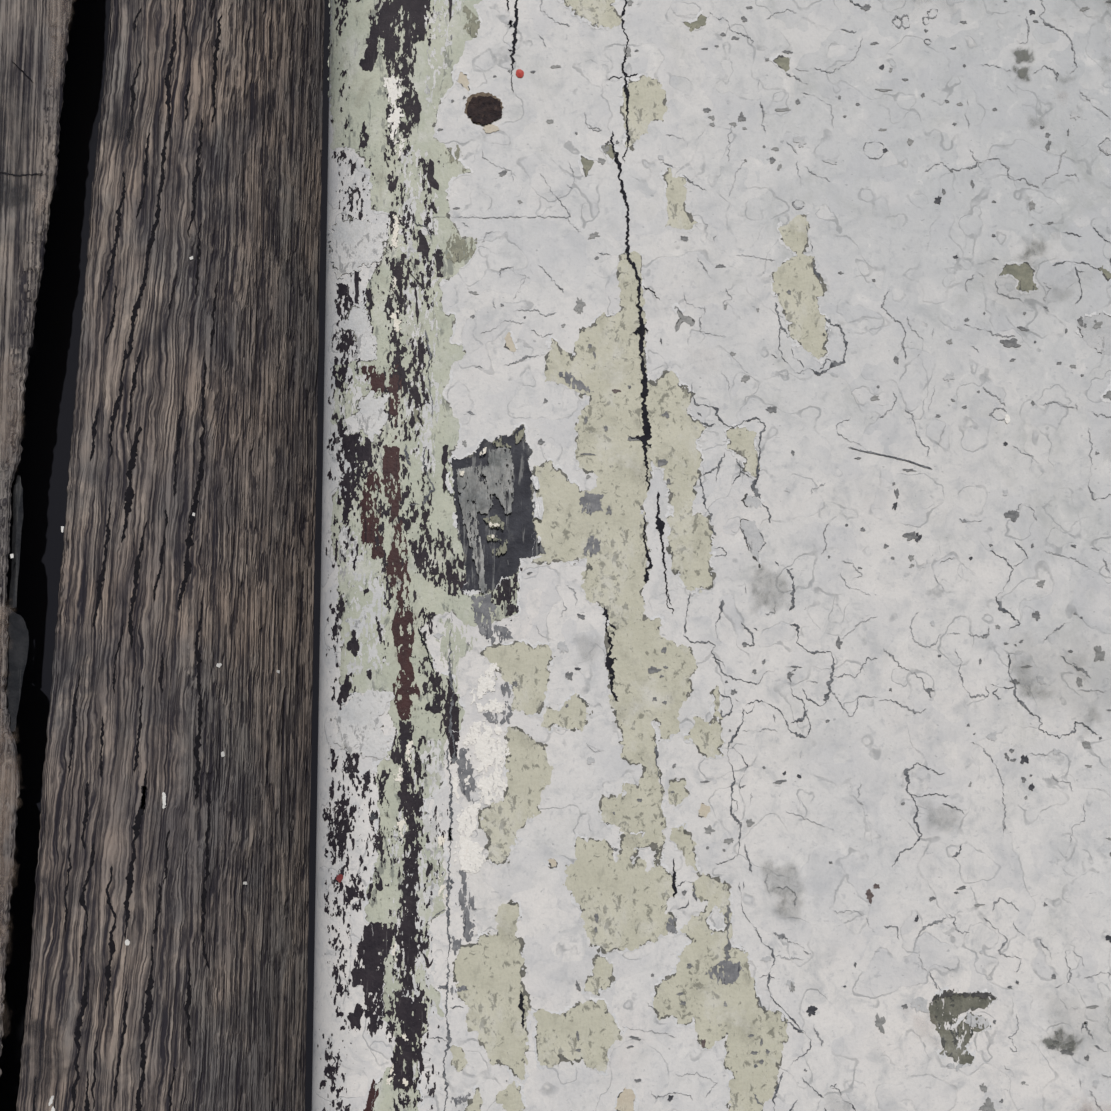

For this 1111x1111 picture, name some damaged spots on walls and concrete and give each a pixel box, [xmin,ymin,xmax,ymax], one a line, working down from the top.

crack [506,0,571,92]
crack [414,151,579,242]
crack [479,266,564,368]
peeling [770,200,831,365]
crack [425,330,433,419]
peeling [317,0,790,1111]
crack [584,0,1111,1111]
crack [537,585,578,641]
crack [418,613,463,1111]
crack [517,990,525,1028]
spalling [902,987,997,1072]